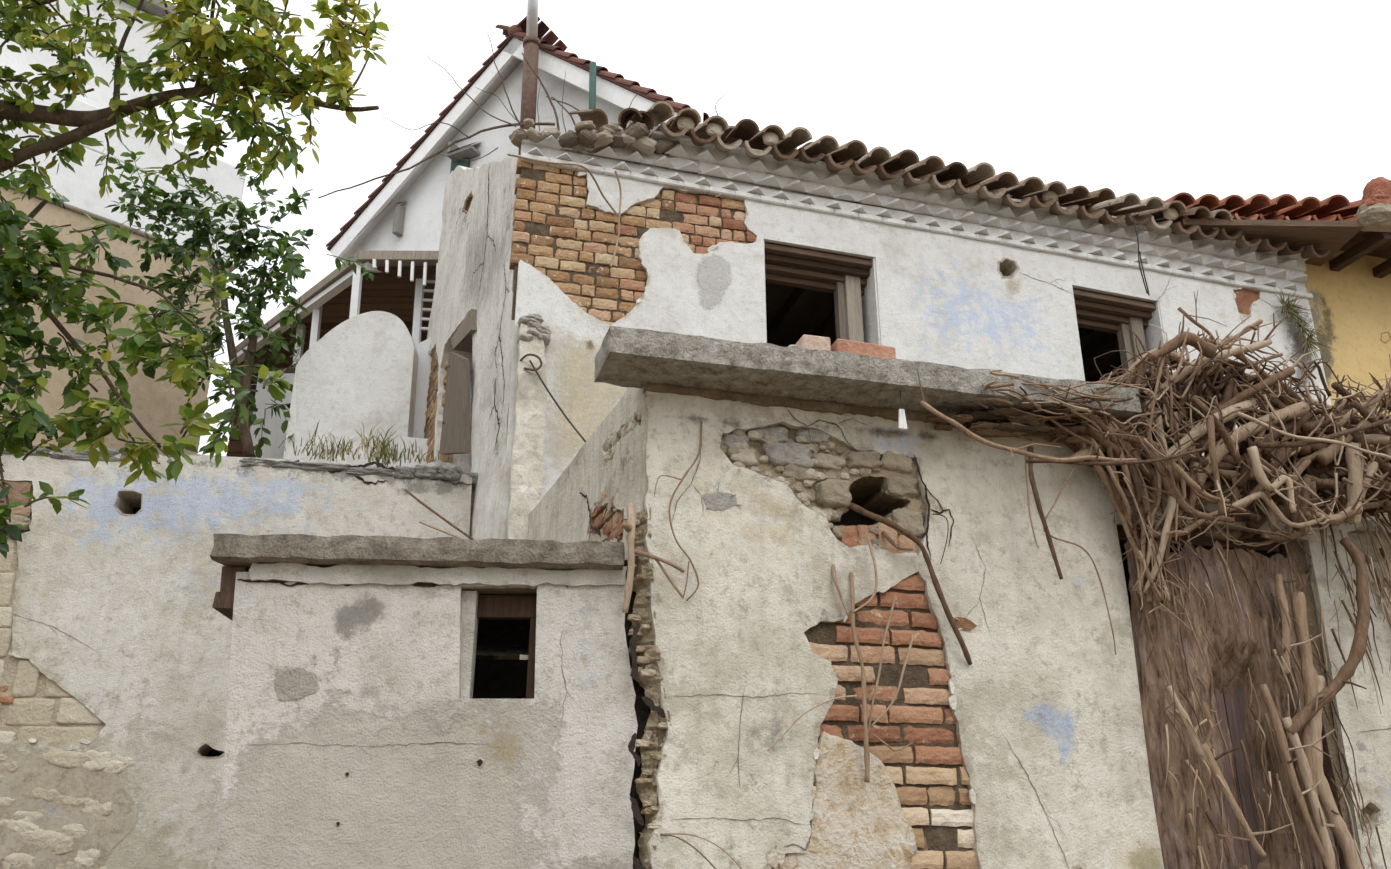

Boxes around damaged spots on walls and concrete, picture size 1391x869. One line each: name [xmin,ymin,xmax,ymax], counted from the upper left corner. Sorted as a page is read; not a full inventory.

flaking render [509,118,757,325]
spalling [997,257,1020,278]
crack [470,173,509,454]
spalling [1232,287,1259,315]
flaking render [589,489,624,542]
spalling [702,485,742,510]
spalling [720,425,927,556]
flaking render [0,481,106,752]
damp [337,598,383,636]
flaking render [764,573,978,869]
crack [238,742,517,756]